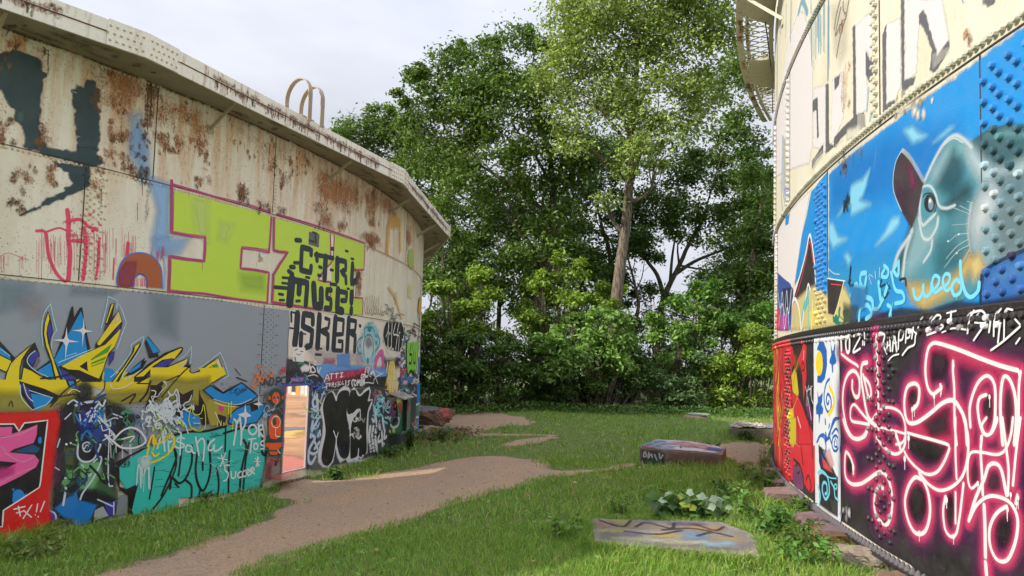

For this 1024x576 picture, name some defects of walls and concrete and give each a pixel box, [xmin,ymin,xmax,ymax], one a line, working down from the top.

corrosion [6,164,58,215]
corrosion [0,0,210,207]
corrosion [214,75,446,249]